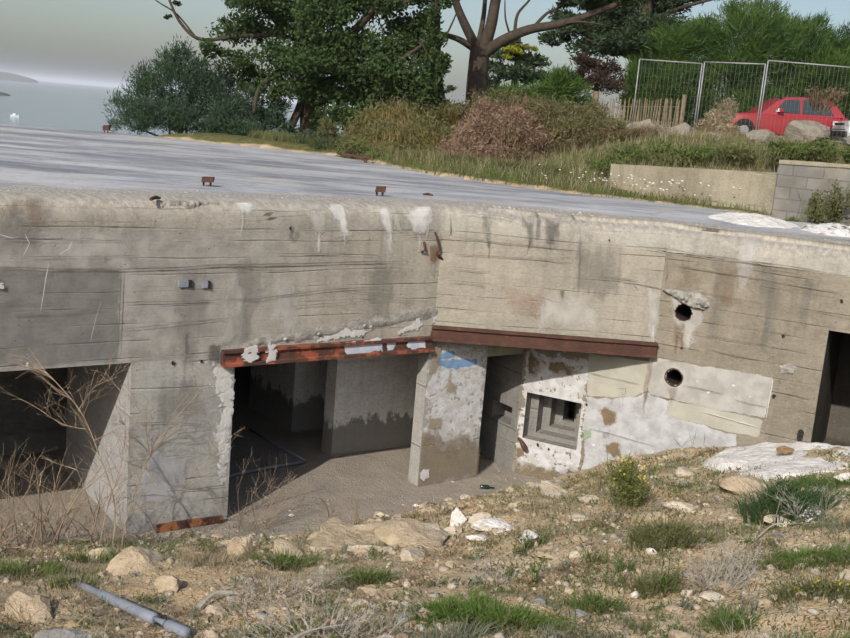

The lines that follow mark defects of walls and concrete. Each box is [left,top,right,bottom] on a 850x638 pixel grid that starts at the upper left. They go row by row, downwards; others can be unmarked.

water stain [235,202,252,213]
water stain [329,204,349,239]
water stain [380,209,392,251]
water stain [406,206,432,244]
peeling [209,307,487,485]
peeling [515,348,737,475]